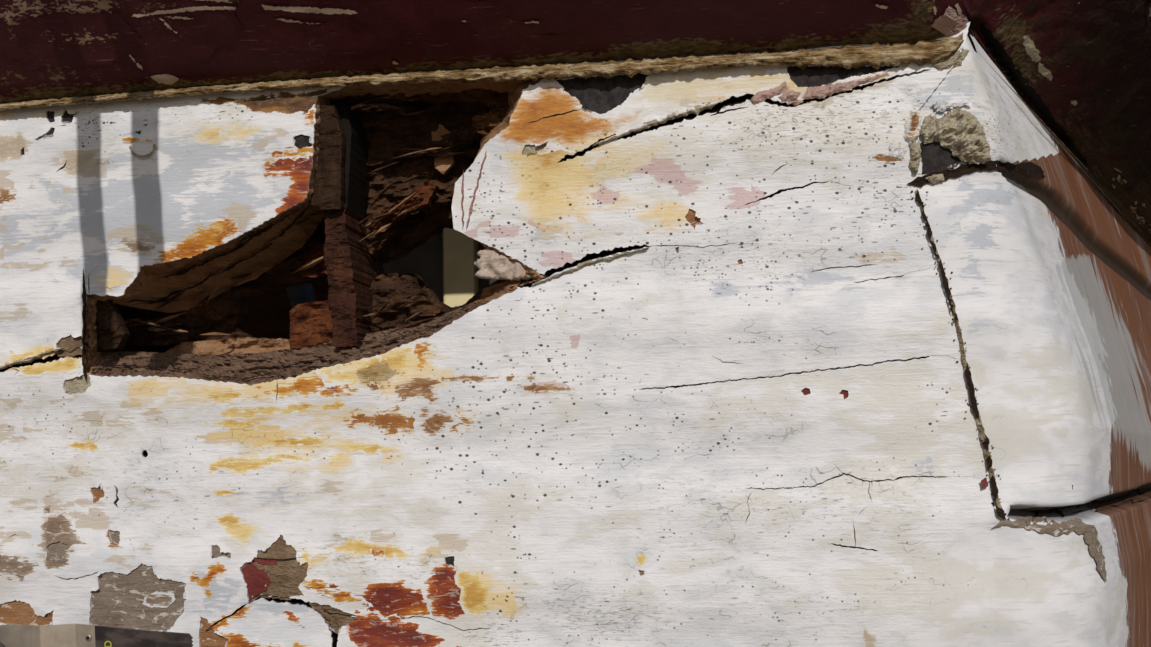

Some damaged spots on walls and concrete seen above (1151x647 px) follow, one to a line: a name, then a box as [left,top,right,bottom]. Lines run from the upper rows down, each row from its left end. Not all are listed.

peeling [0,0,242,94]
corrosion [259,138,314,218]
corrosion [483,78,650,246]
crack [560,70,929,162]
peeling [921,141,961,175]
crack [517,243,731,288]
crack [0,347,86,372]
crack [639,160,1151,520]
peeling [90,564,186,632]
corrosion [208,602,319,647]
peeling [241,535,356,634]
corrosion [299,547,494,647]